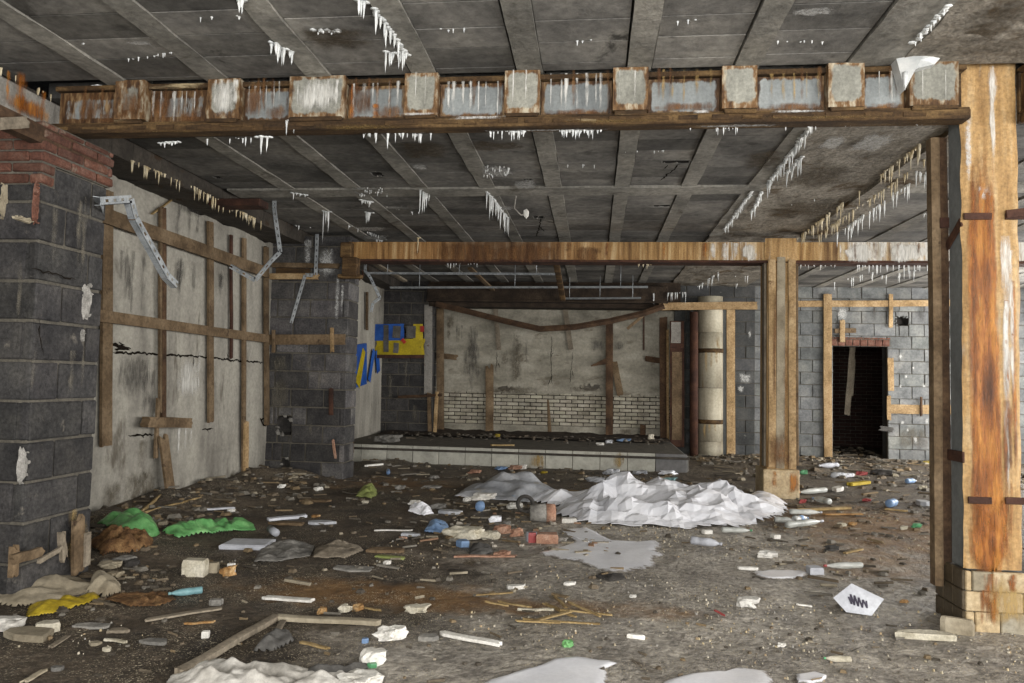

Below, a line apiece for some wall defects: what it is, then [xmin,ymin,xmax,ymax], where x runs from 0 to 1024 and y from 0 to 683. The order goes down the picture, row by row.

rust [6,71,46,119]
rust [340,79,399,129]
spalling [0,181,40,225]
spalling [80,283,94,341]
crack [113,342,263,365]
rust [968,176,1017,621]
spalling [16,447,31,484]